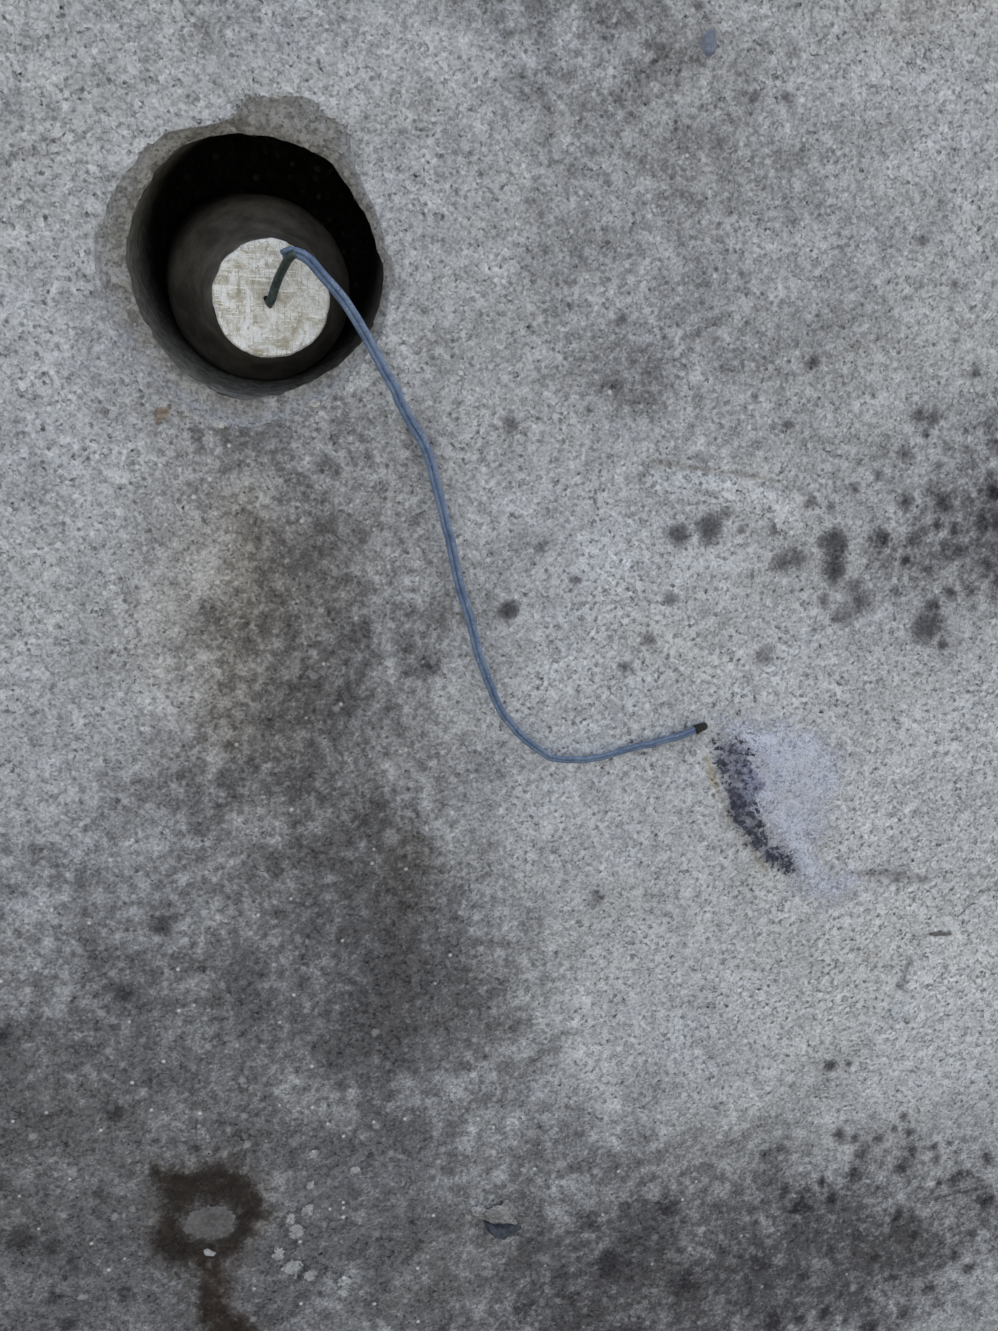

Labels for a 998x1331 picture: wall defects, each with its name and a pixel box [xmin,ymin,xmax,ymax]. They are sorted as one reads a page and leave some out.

leakage [271,1181,318,1283]
leakage [337,1274,353,1299]